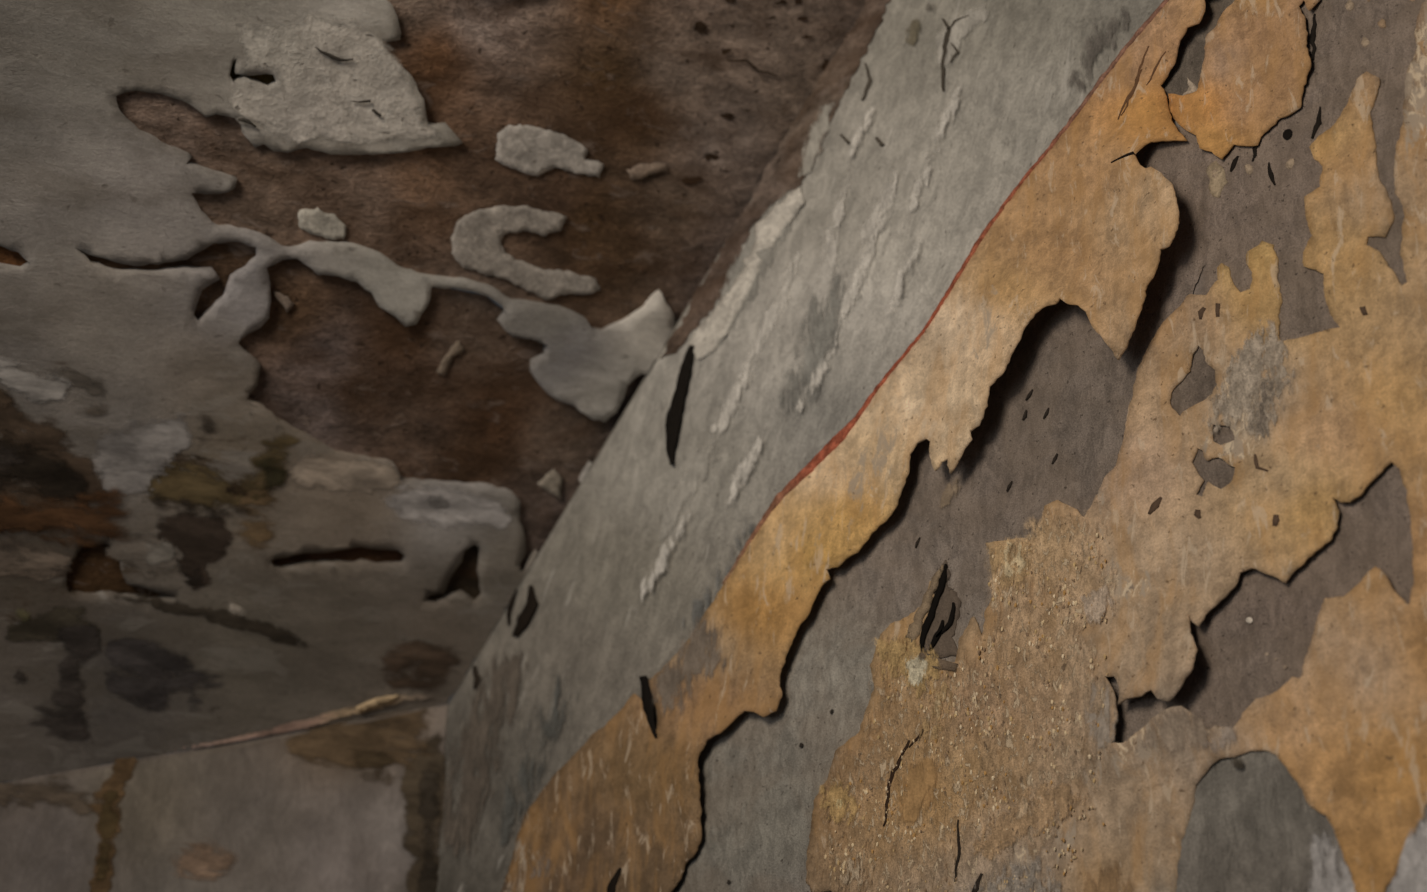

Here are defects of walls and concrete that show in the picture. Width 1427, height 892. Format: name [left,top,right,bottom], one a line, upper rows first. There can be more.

spalling [82,0,866,568]
damp [0,389,128,547]
damp [115,435,307,646]
peeling [501,0,1427,892]
damp [5,607,221,739]